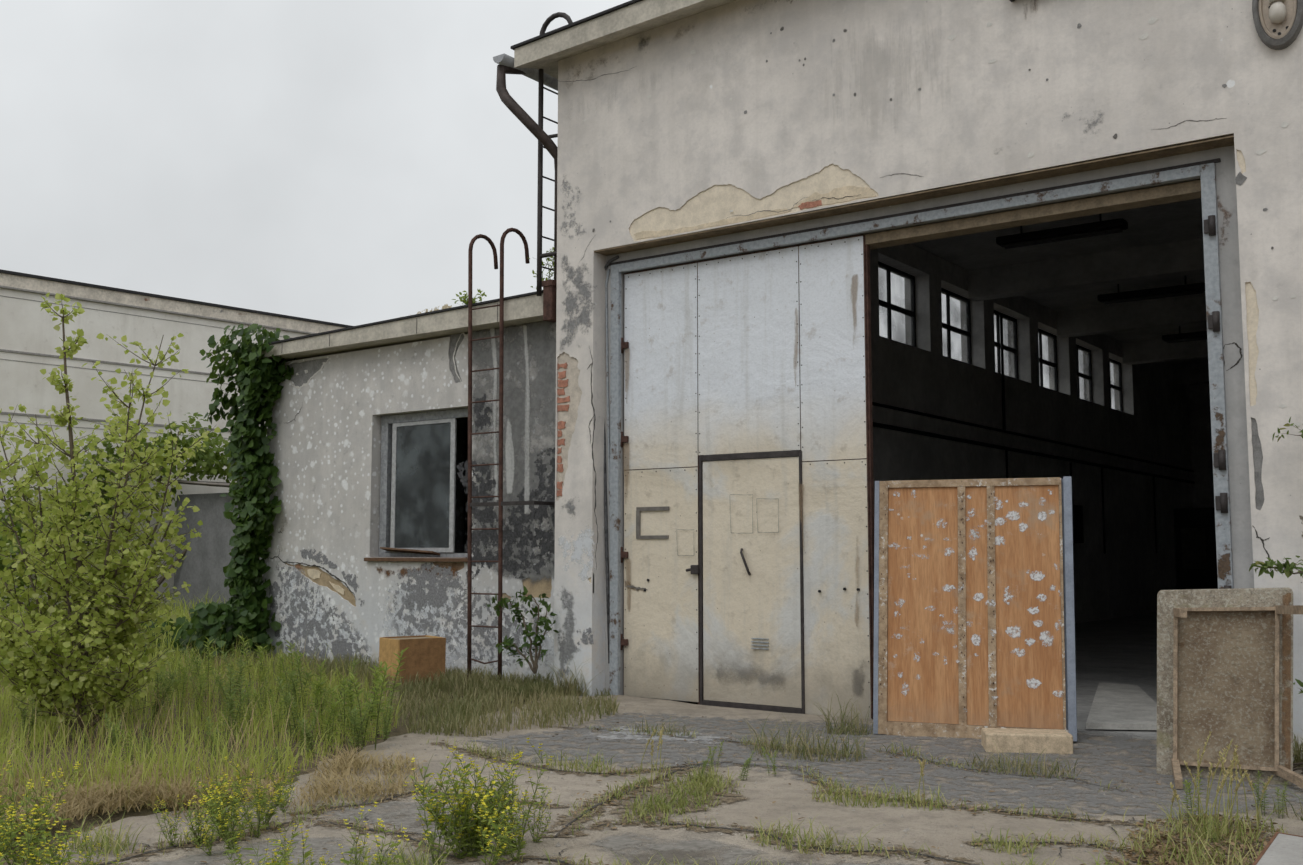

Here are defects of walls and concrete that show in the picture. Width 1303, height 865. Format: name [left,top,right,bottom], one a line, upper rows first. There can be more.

crack [1151,118,1226,130]
flaking render [629,164,879,241]
flaking render [557,352,582,501]
peeling [269,549,370,663]
peeling [393,562,552,662]